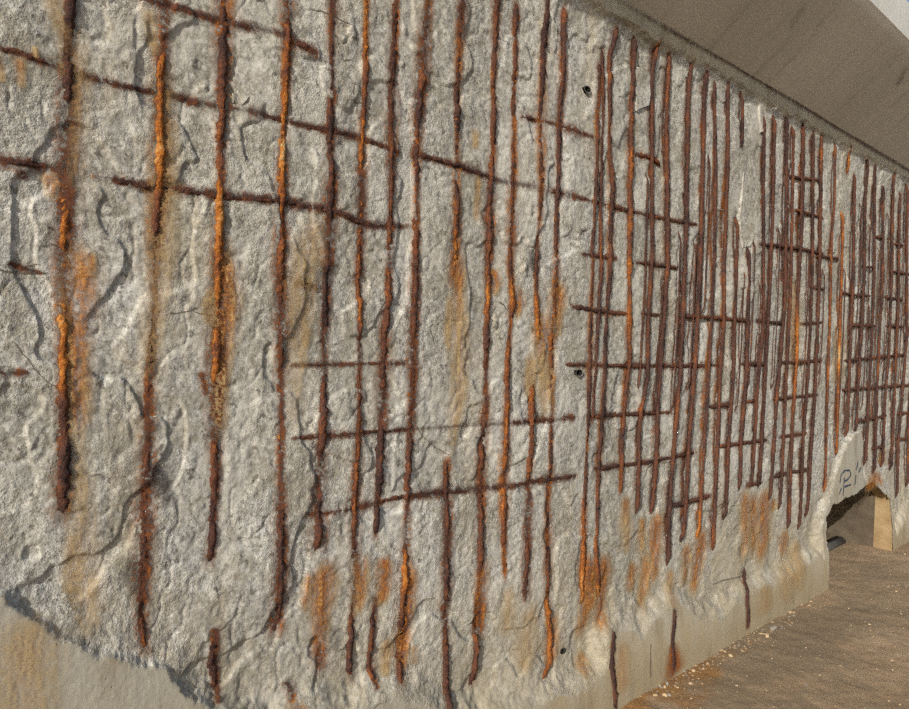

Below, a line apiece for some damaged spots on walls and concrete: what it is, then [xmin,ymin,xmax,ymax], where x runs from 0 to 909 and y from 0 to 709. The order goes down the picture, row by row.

rust [144,0,309,51]
rust [116,82,359,139]
rust [114,137,388,228]
rust [67,254,96,432]
rust [437,266,573,441]
spalling [358,432,377,506]
spalling [380,430,408,501]
rust [410,480,541,501]
spalling [585,418,600,603]
spalling [601,416,621,466]
spalling [624,415,638,463]
spalling [861,387,909,537]